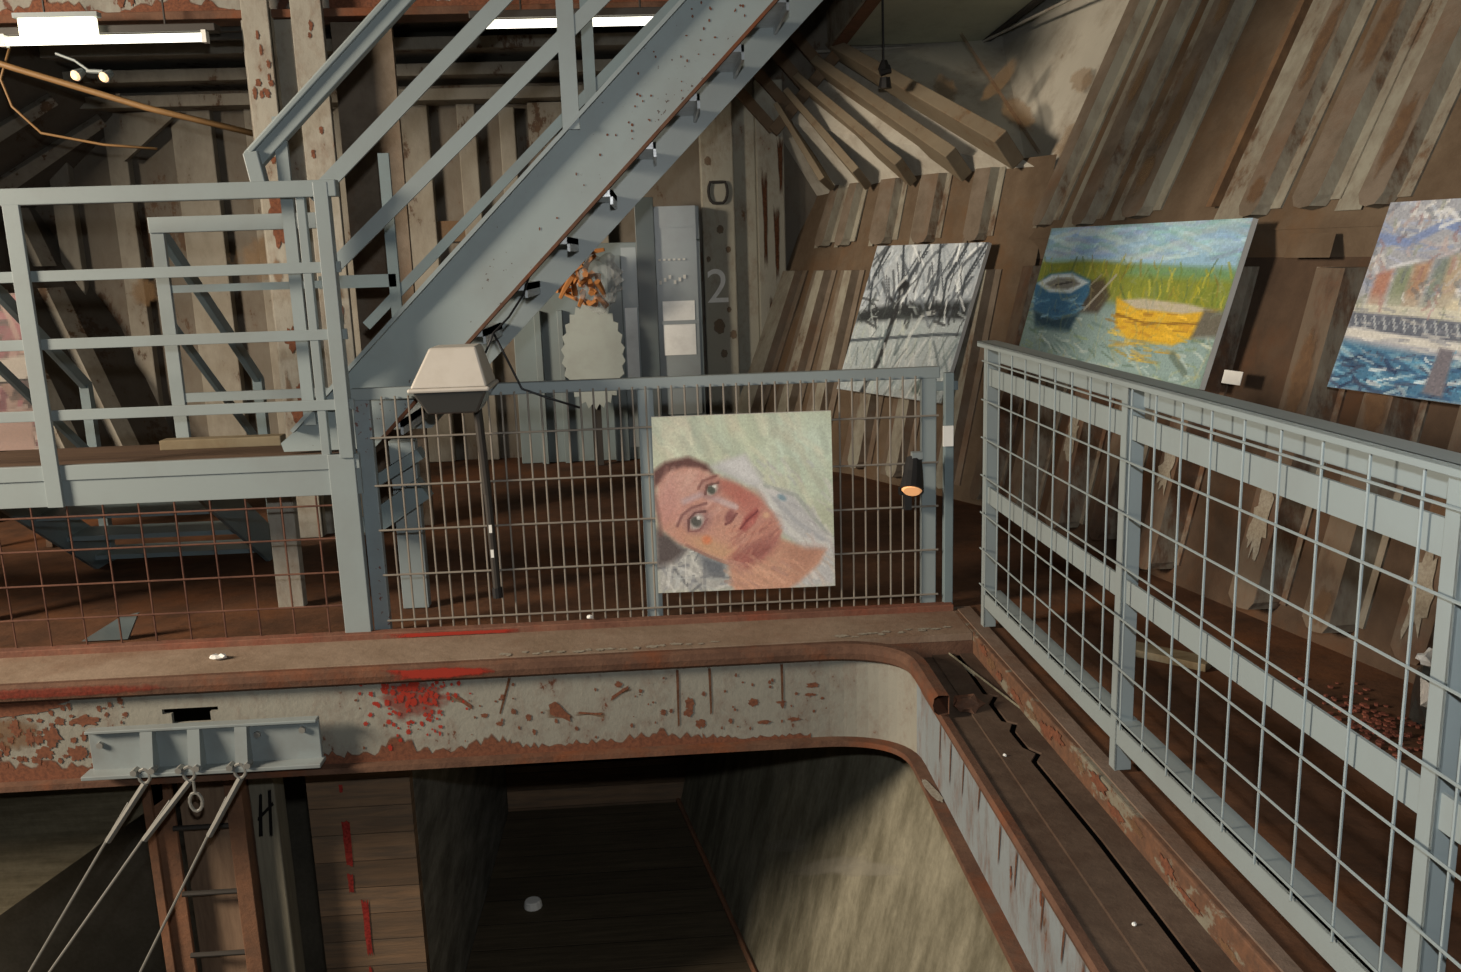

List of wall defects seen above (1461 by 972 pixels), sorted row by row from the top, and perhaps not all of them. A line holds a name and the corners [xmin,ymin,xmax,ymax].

peeling [0,0,235,15]
peeling [329,0,381,8]
spalling [164,706,218,722]
spalling [549,686,630,722]
rust [939,726,980,809]
spalling [0,783,203,972]
spalling [283,776,327,972]
rust [998,824,1018,889]